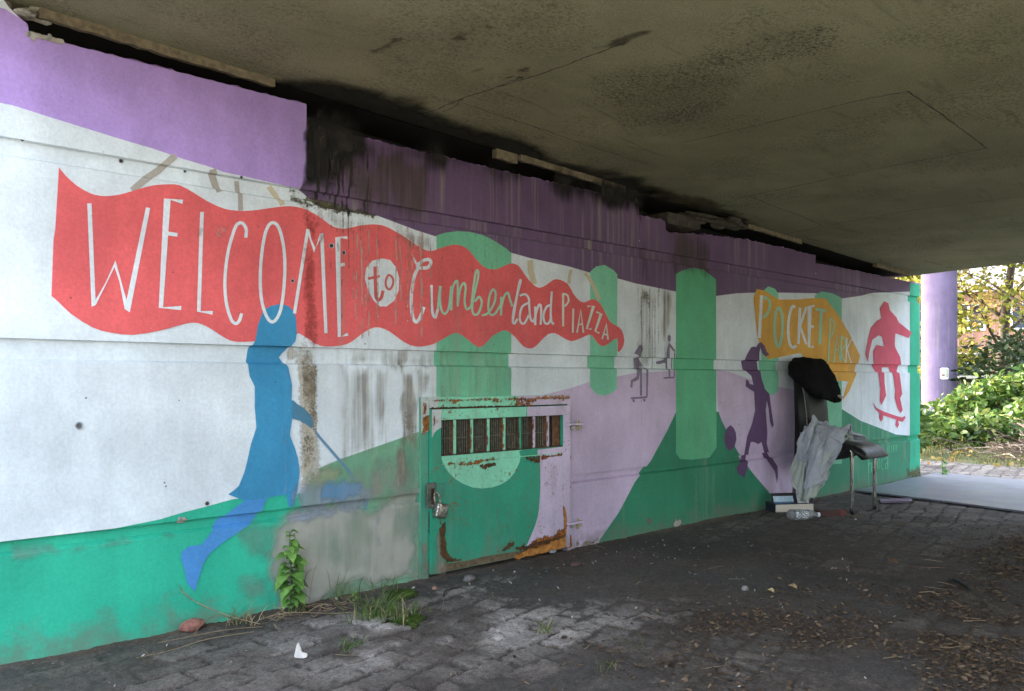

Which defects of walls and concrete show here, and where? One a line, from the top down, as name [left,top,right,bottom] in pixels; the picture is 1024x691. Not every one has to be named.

spalling [5,0,65,44]
water stain [305,111,369,217]
water stain [553,173,643,216]
spalling [677,211,749,231]
water stain [287,261,319,487]
water stain [398,376,415,483]
corrosion [448,428,496,470]
corrosion [422,395,570,435]
corrosion [519,422,562,463]
corrosion [422,512,462,572]
corrosion [502,506,572,560]